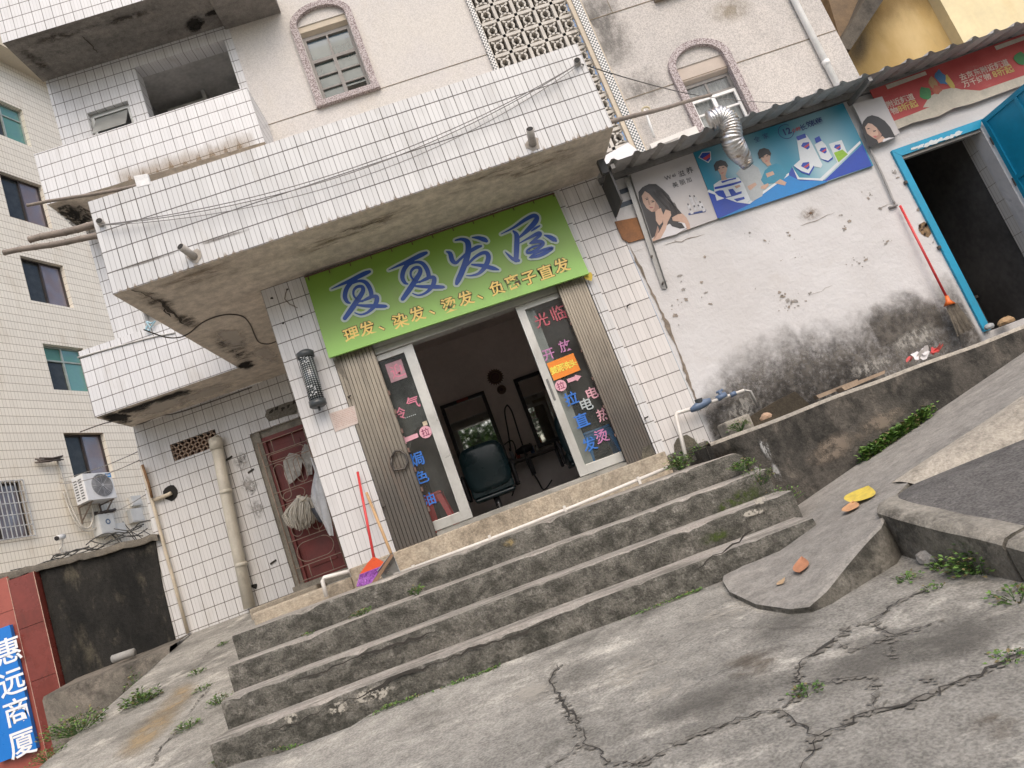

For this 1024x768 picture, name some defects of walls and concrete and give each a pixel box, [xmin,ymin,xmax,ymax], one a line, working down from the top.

water stain [187,10,216,32]
water stain [219,341,254,369]
water stain [706,296,981,441]
water stain [815,437,849,461]
crack [696,529,754,570]
crack [548,591,1016,768]
spalling [329,687,394,714]